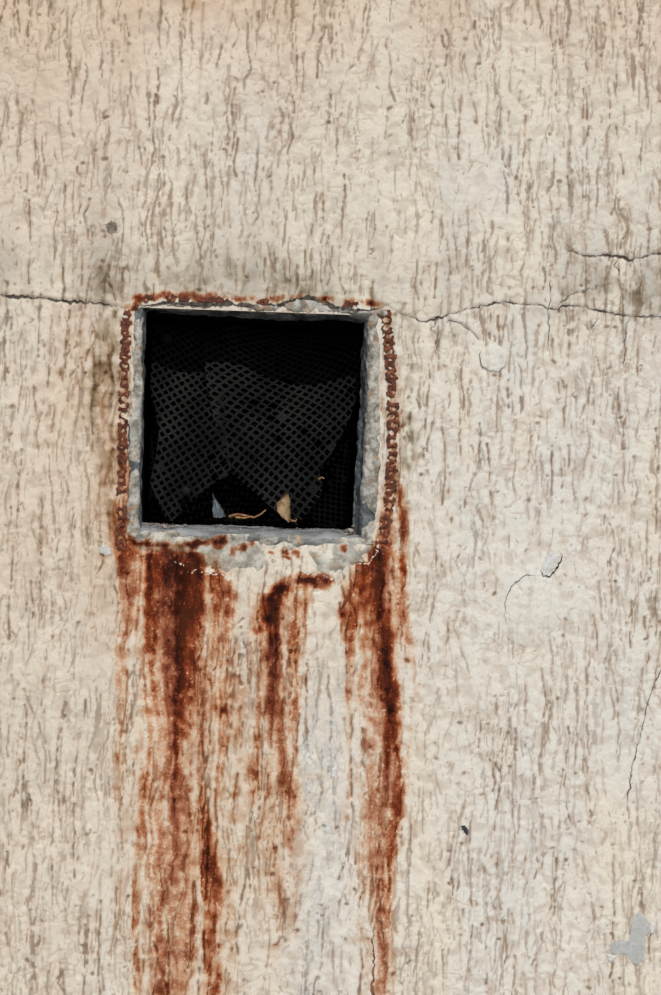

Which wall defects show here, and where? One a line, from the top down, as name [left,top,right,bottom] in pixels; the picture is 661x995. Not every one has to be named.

rust [131,292,210,311]
crack [1,250,661,365]
rust [399,493,407,540]
rust [118,510,253,995]
rust [257,572,332,798]
rust [339,513,406,891]
peeling [606,912,656,965]